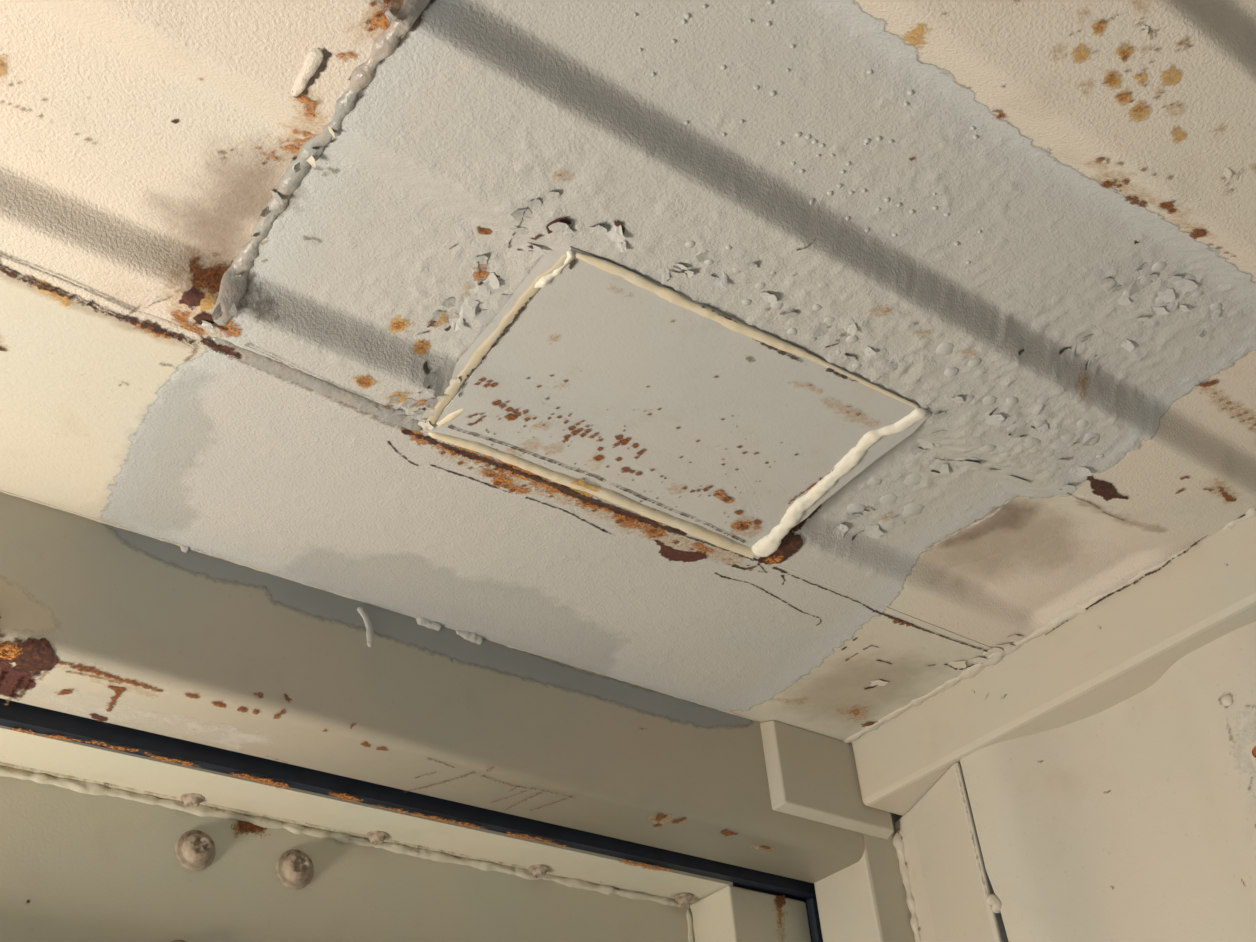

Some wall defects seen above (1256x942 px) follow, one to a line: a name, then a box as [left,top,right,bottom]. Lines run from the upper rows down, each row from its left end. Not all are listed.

peeling [290,47,331,98]
corrosion [1103,18,1181,122]
peeling [419,255,513,334]
crack [458,296,533,397]
crack [702,306,855,381]
corrosion [0,253,732,566]
peeling [654,540,707,563]
crack [387,426,988,690]
corrosion [676,486,761,536]
peeling [753,504,822,565]
peeling [1086,476,1129,501]
corrosion [0,633,162,722]